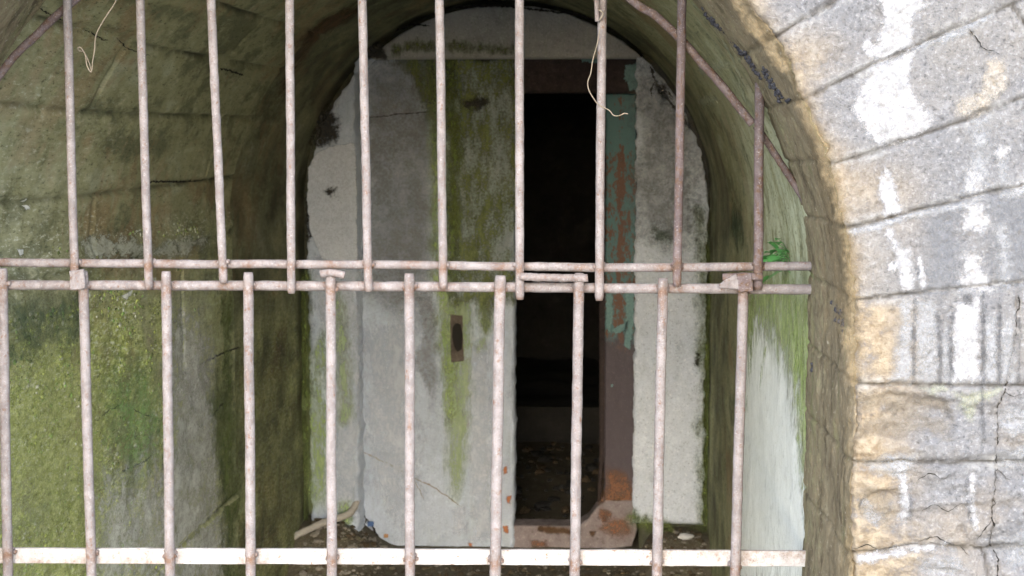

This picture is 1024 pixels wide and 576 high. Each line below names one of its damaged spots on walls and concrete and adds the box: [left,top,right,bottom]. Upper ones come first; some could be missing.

damp [853,0,993,146]
damp [8,297,80,365]
damp [365,60,491,538]
damp [851,59,1024,435]
damp [98,306,224,548]
damp [99,564,223,576]
corrosion [532,526,570,548]
corrosion [589,471,632,537]
crack [921,295,1021,576]
damp [964,472,979,530]